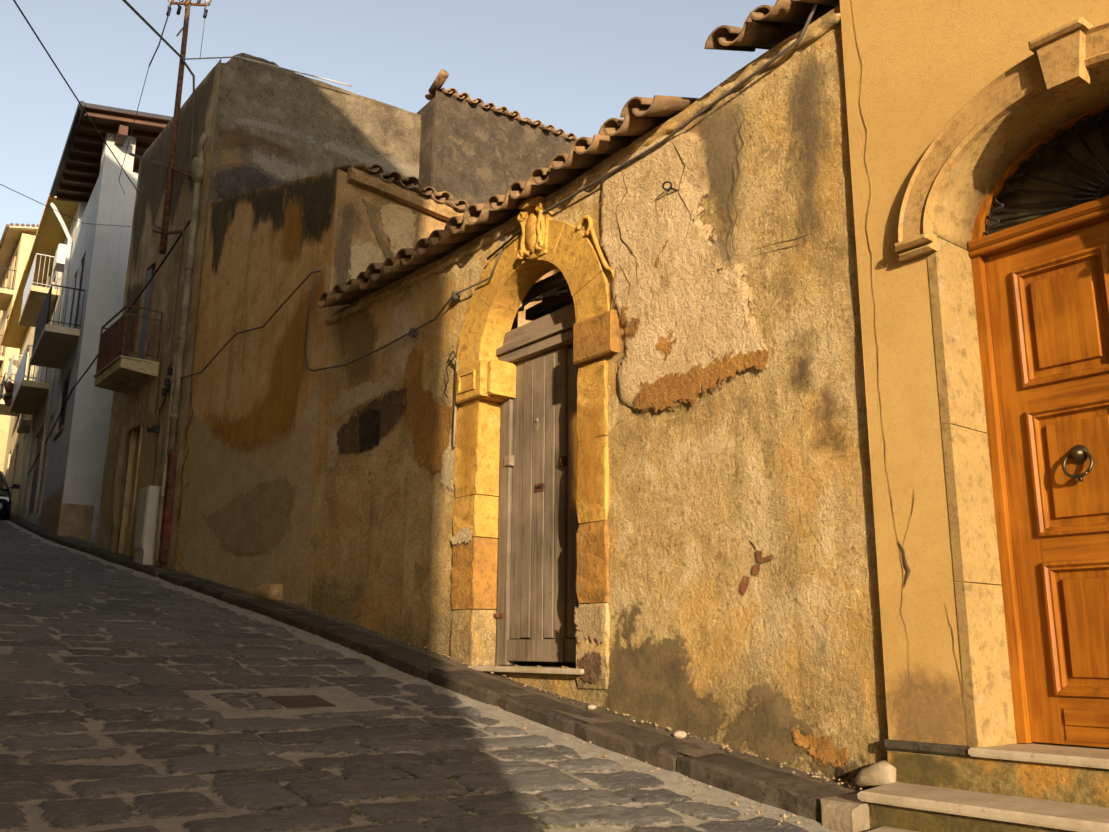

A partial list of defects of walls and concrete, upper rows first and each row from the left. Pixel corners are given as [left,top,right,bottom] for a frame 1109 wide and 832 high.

damp [123,284,142,356]
damp [133,68,215,267]
damp [210,128,355,285]
peeling [183,299,456,605]
flaking render [600,129,776,415]
damp [794,357,810,387]
damp [791,57,821,231]
crack [851,0,970,728]
damp [602,598,867,783]
damp [880,677,976,785]